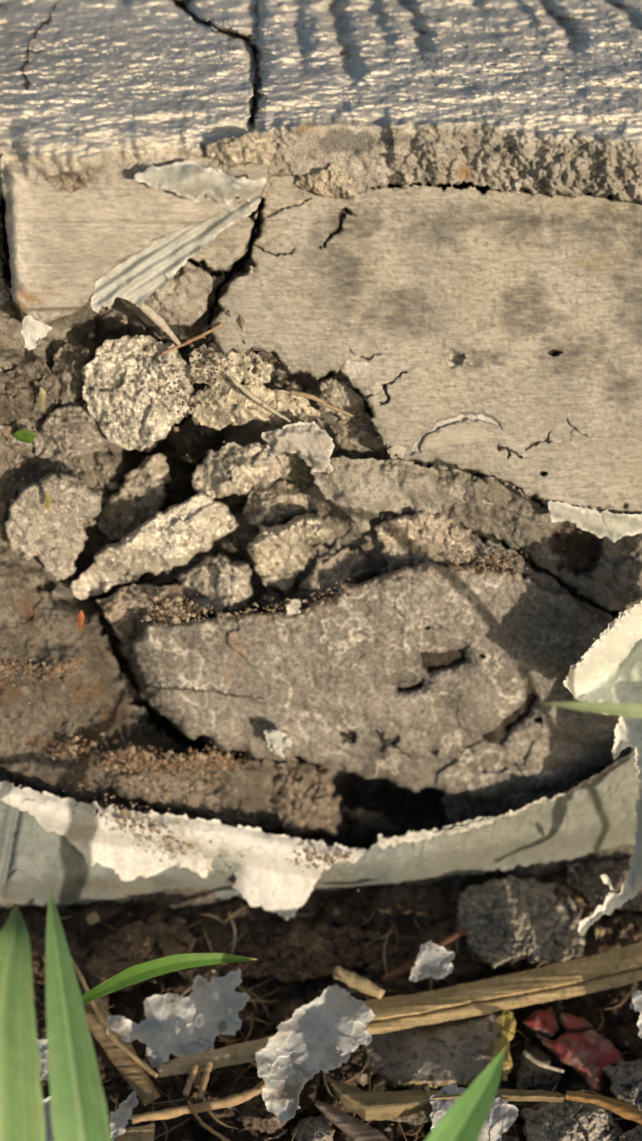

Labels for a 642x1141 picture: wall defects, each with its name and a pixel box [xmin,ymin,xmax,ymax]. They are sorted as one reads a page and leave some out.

crack [20,0,60,90]
crack [179,0,261,123]
crack [324,208,354,246]
crack [191,197,294,340]
spalling [338,354,383,395]
spalling [445,349,477,367]
spalling [387,413,501,458]